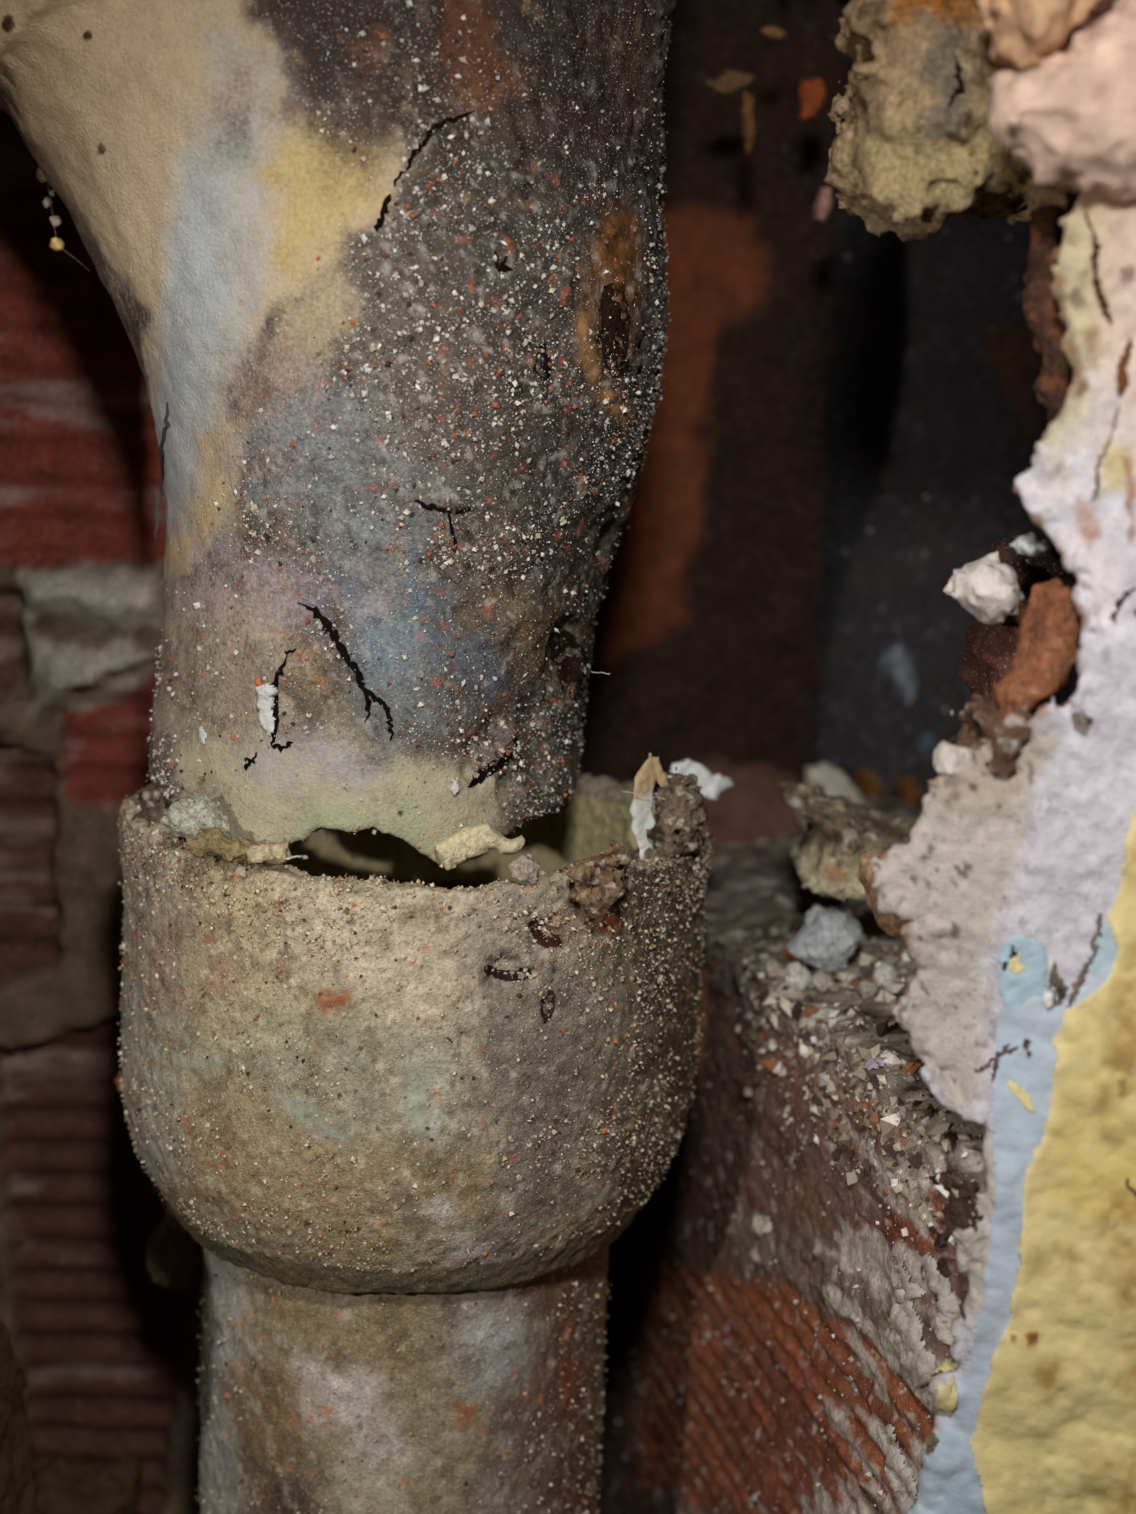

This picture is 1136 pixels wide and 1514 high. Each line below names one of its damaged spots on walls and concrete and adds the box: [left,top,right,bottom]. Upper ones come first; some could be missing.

crack [374,110,475,232]
rust [578,319,619,414]
crack [244,602,394,770]
spalling [468,736,520,788]
flaking render [933,740,968,776]